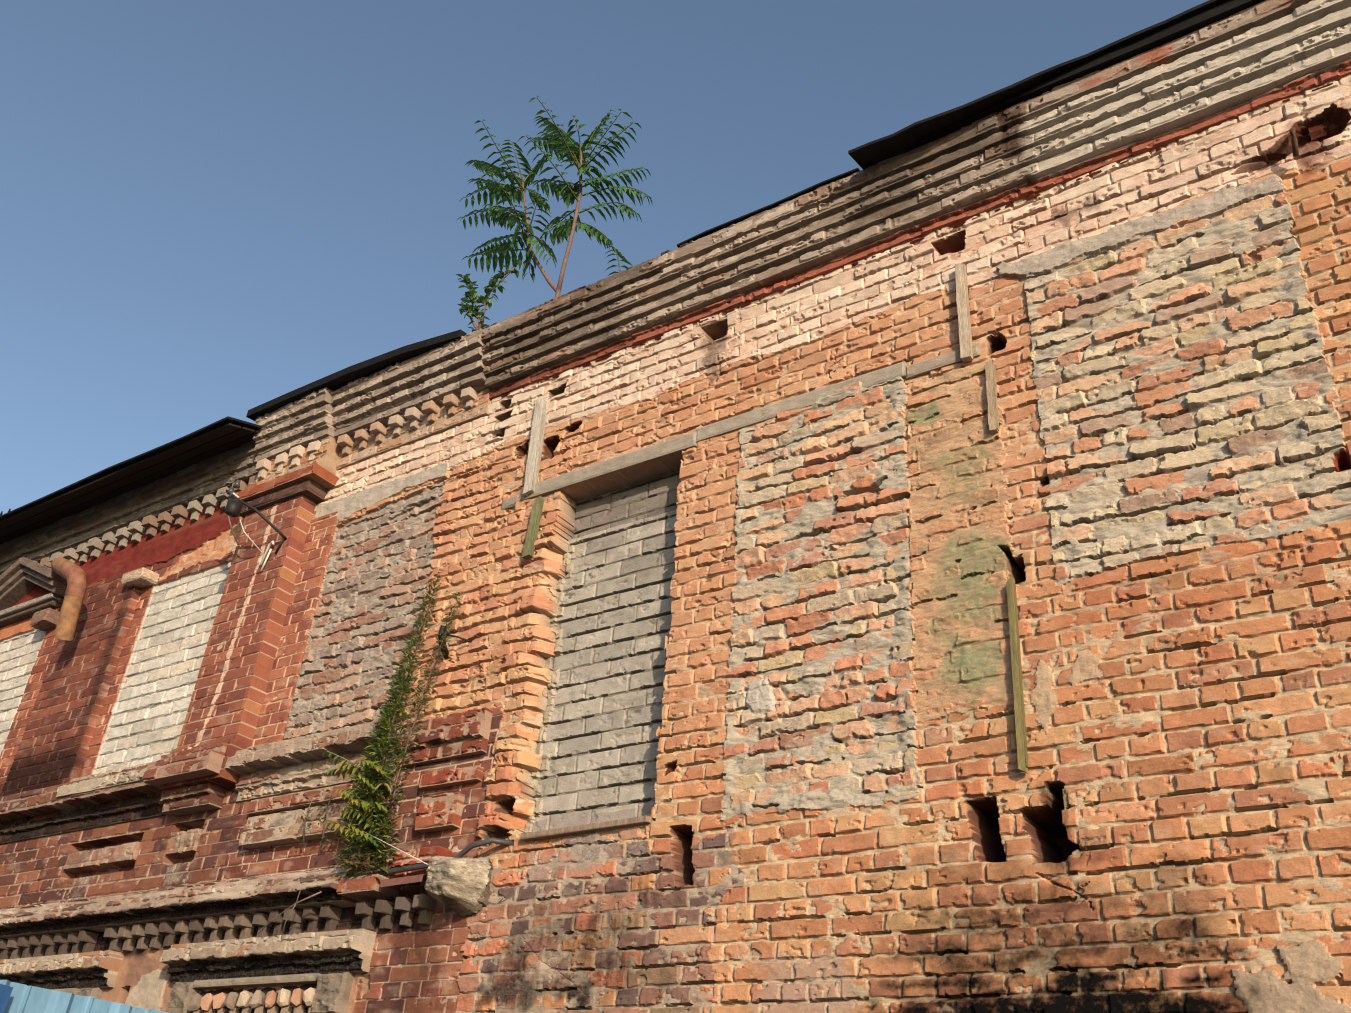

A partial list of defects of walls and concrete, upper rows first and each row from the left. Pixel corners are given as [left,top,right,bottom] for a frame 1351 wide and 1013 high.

spalling [1231,103,1351,175]